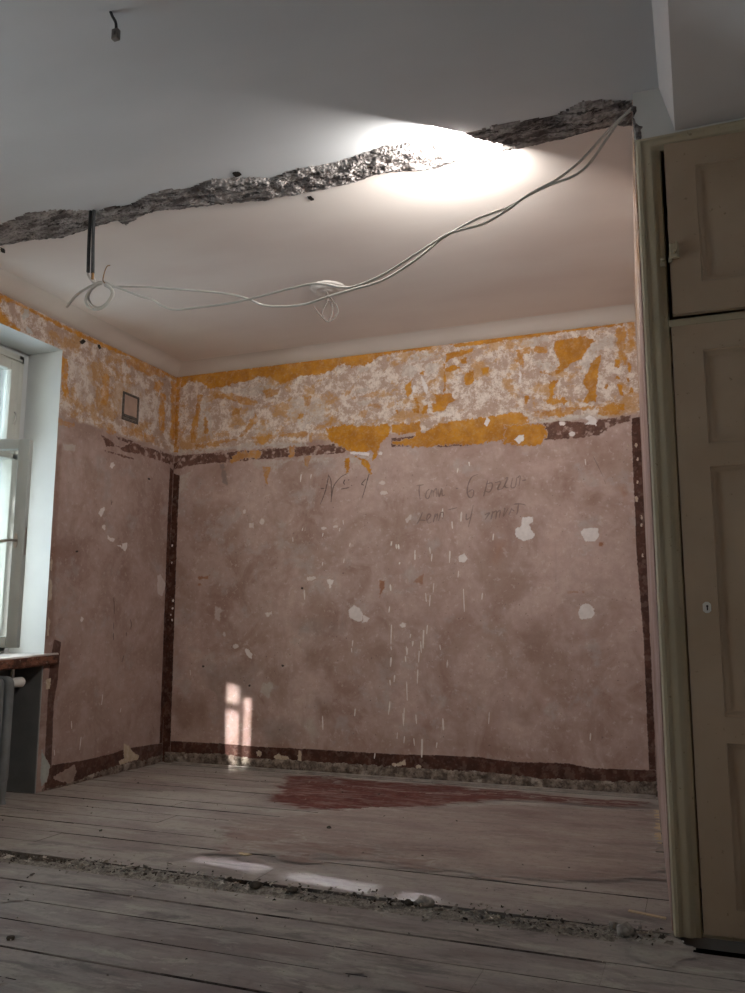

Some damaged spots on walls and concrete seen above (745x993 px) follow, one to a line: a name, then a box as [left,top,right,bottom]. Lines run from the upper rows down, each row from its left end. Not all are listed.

spalling [0,99,643,253]
peeling [0,293,636,485]